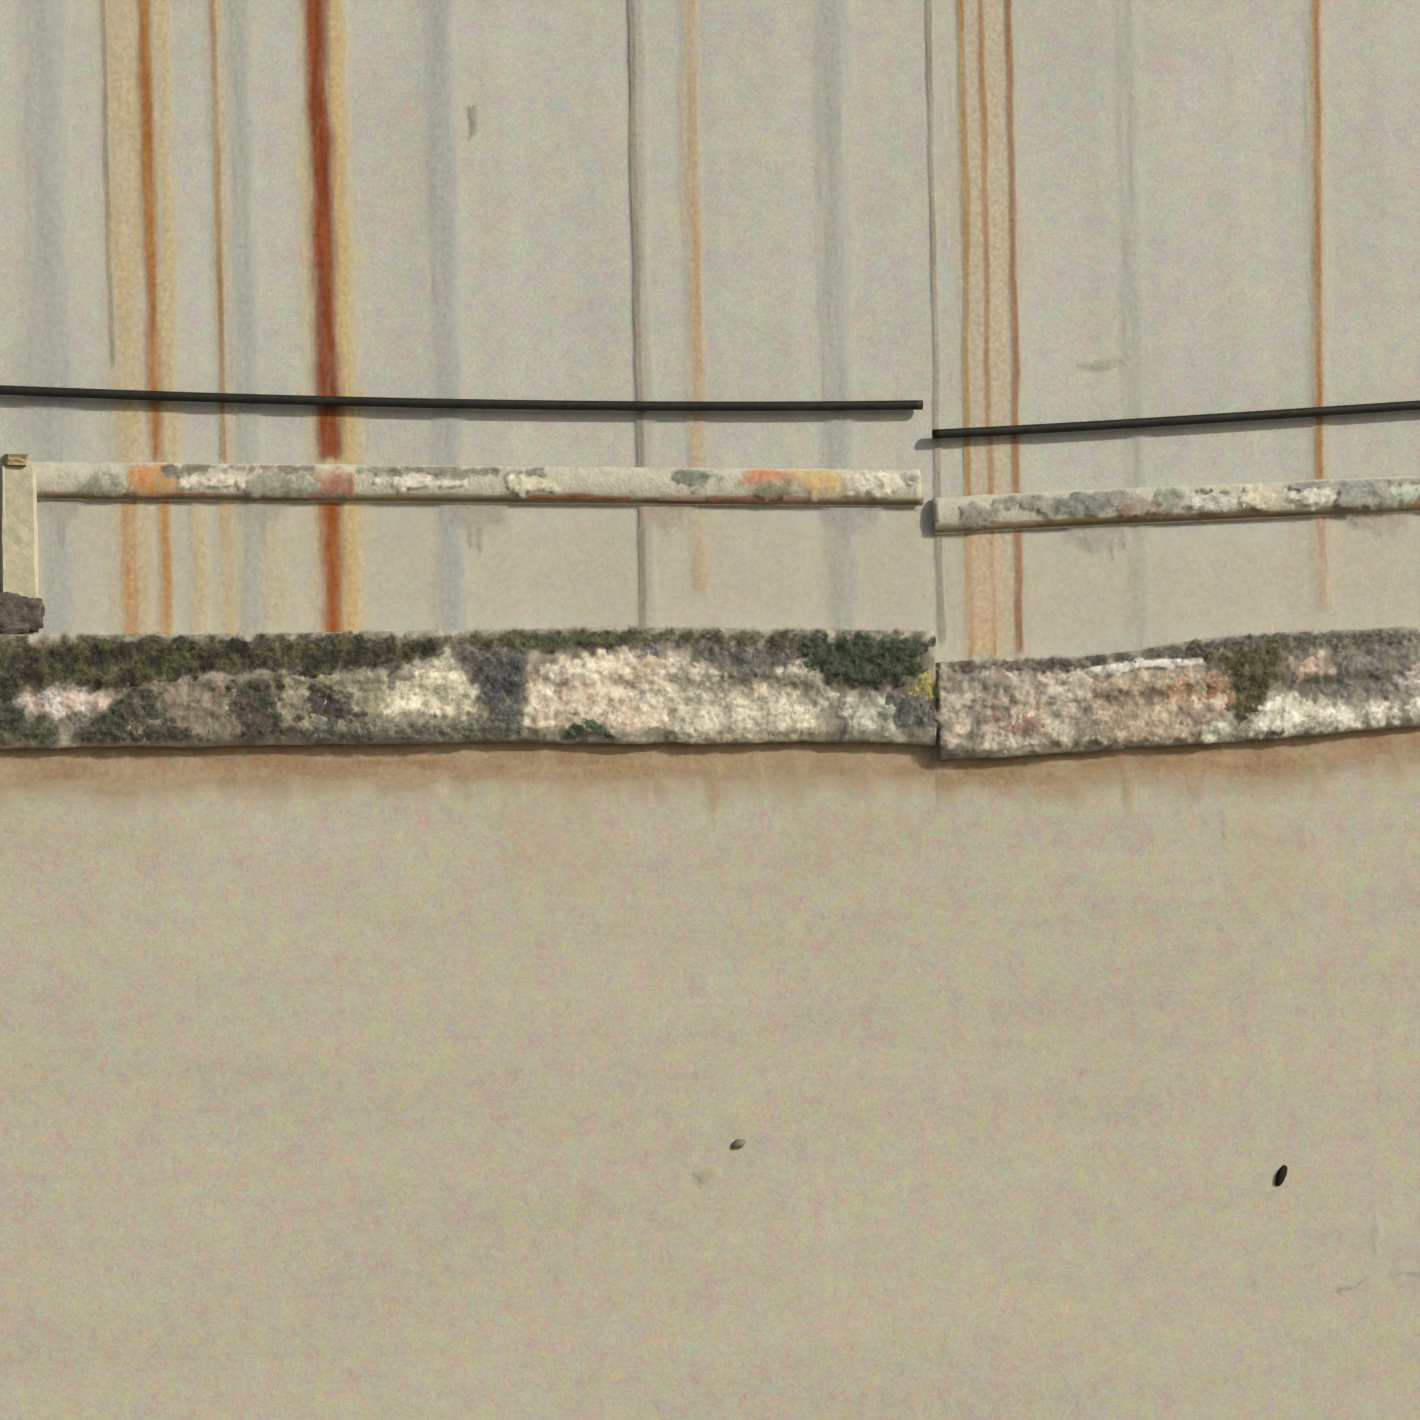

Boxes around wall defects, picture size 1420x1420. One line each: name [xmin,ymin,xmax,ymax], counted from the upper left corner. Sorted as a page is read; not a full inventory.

corrosion [37,0,942,635]
corrosion [958,0,1020,496]
corrosion [1309,0,1328,479]
water stain [0,694,1420,800]
corrosion [935,501,1420,658]